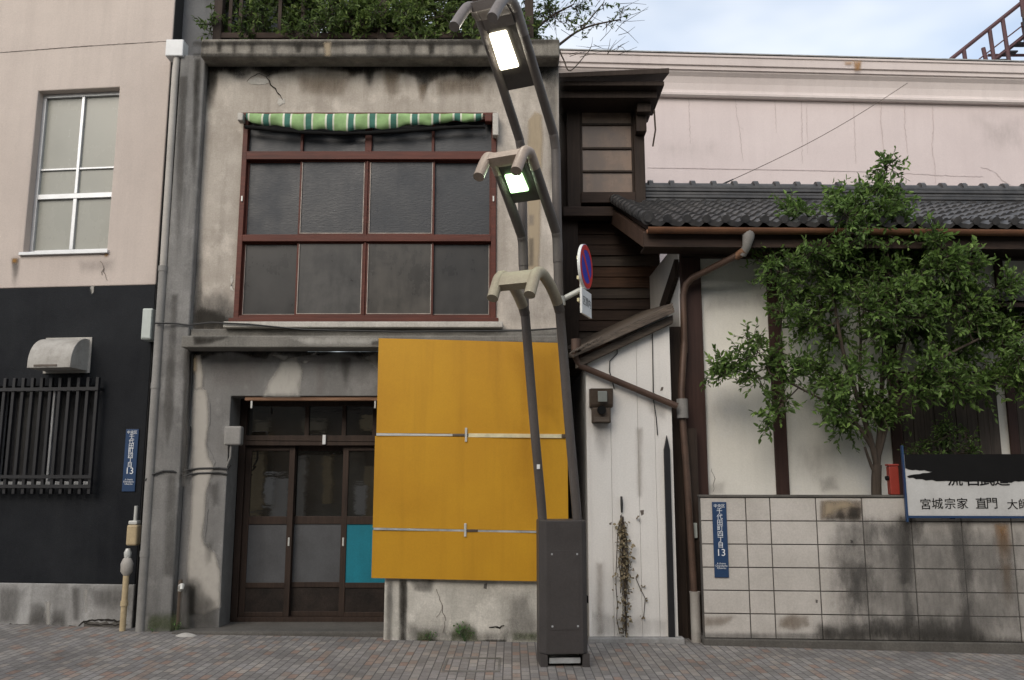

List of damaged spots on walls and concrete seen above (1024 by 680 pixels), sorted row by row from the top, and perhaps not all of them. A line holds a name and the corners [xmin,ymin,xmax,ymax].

damp [178,39,492,190]
crack [880,103,1013,186]
peeling [188,355,220,612]
damp [821,501,860,518]
damp [899,518,919,582]
damp [30,602,63,624]